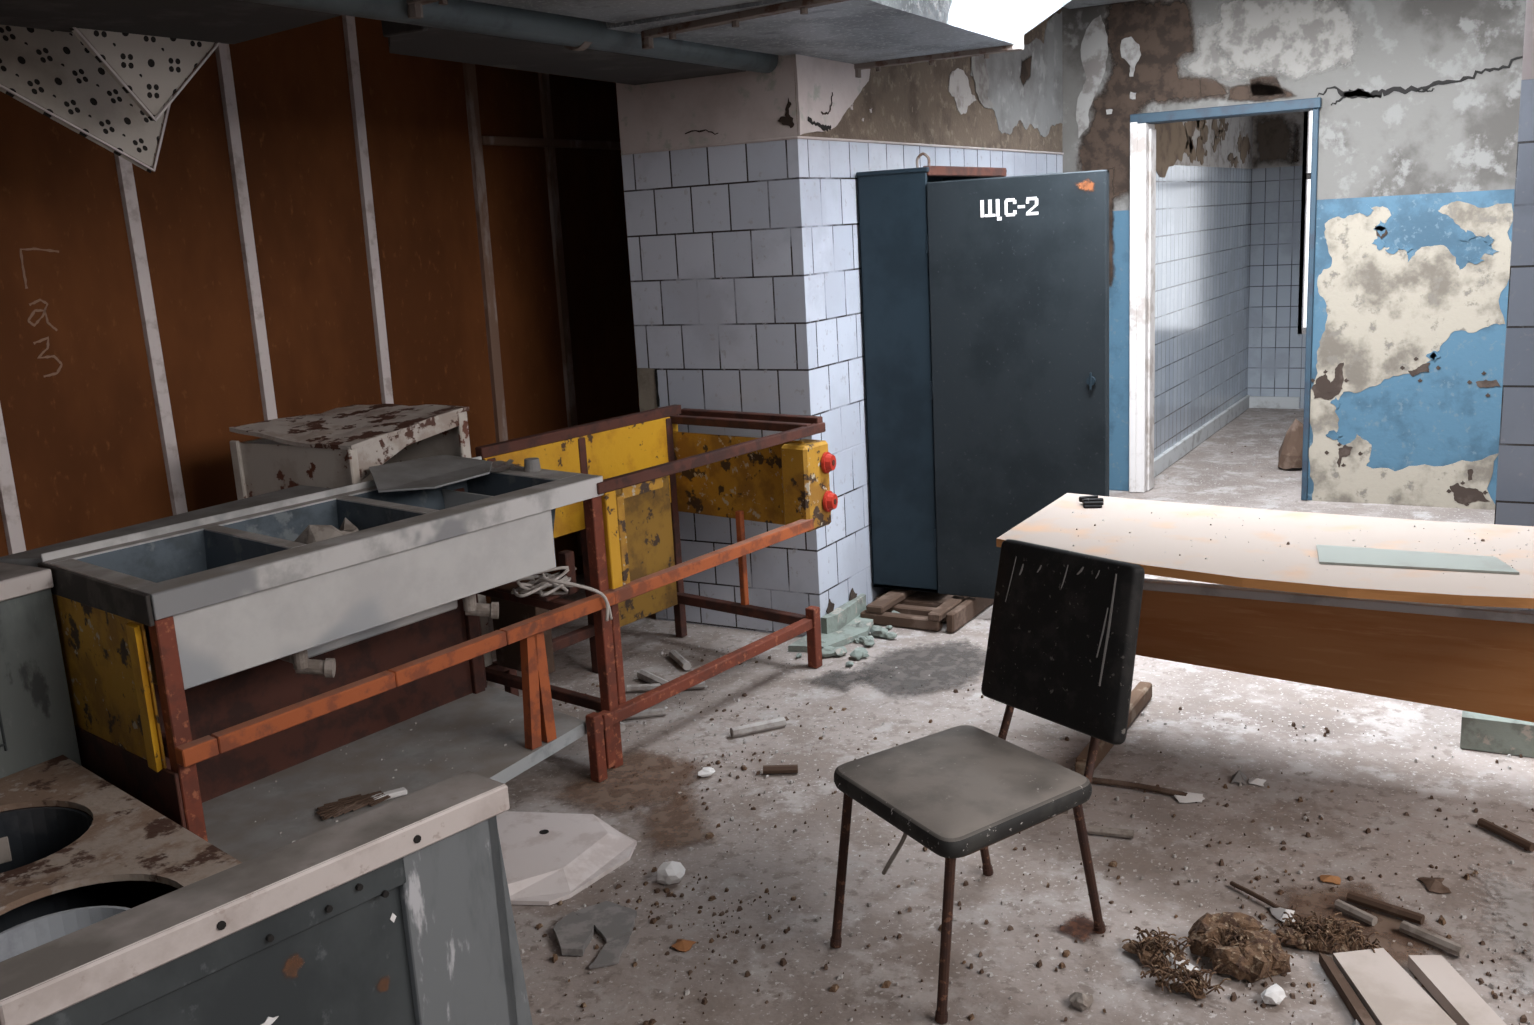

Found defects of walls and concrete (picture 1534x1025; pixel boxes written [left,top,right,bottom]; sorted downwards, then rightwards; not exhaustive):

peeling [1183,0,1357,82]
crack [1317,56,1523,105]
peeling [1309,201,1513,510]